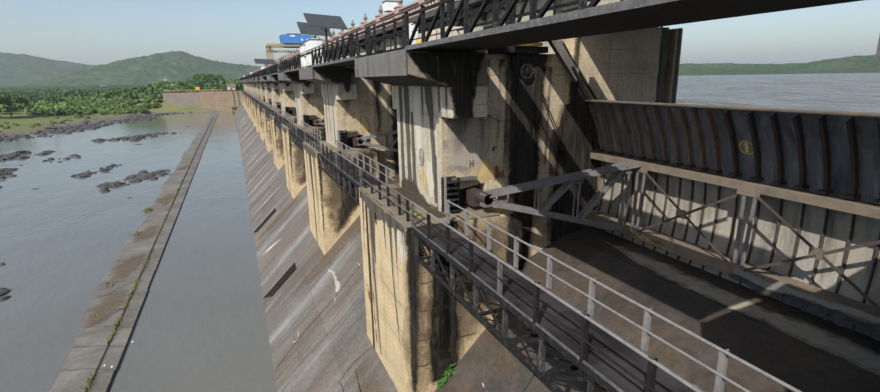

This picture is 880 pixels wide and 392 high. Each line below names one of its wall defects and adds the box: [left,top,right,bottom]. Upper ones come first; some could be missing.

damp [270,51,603,392]